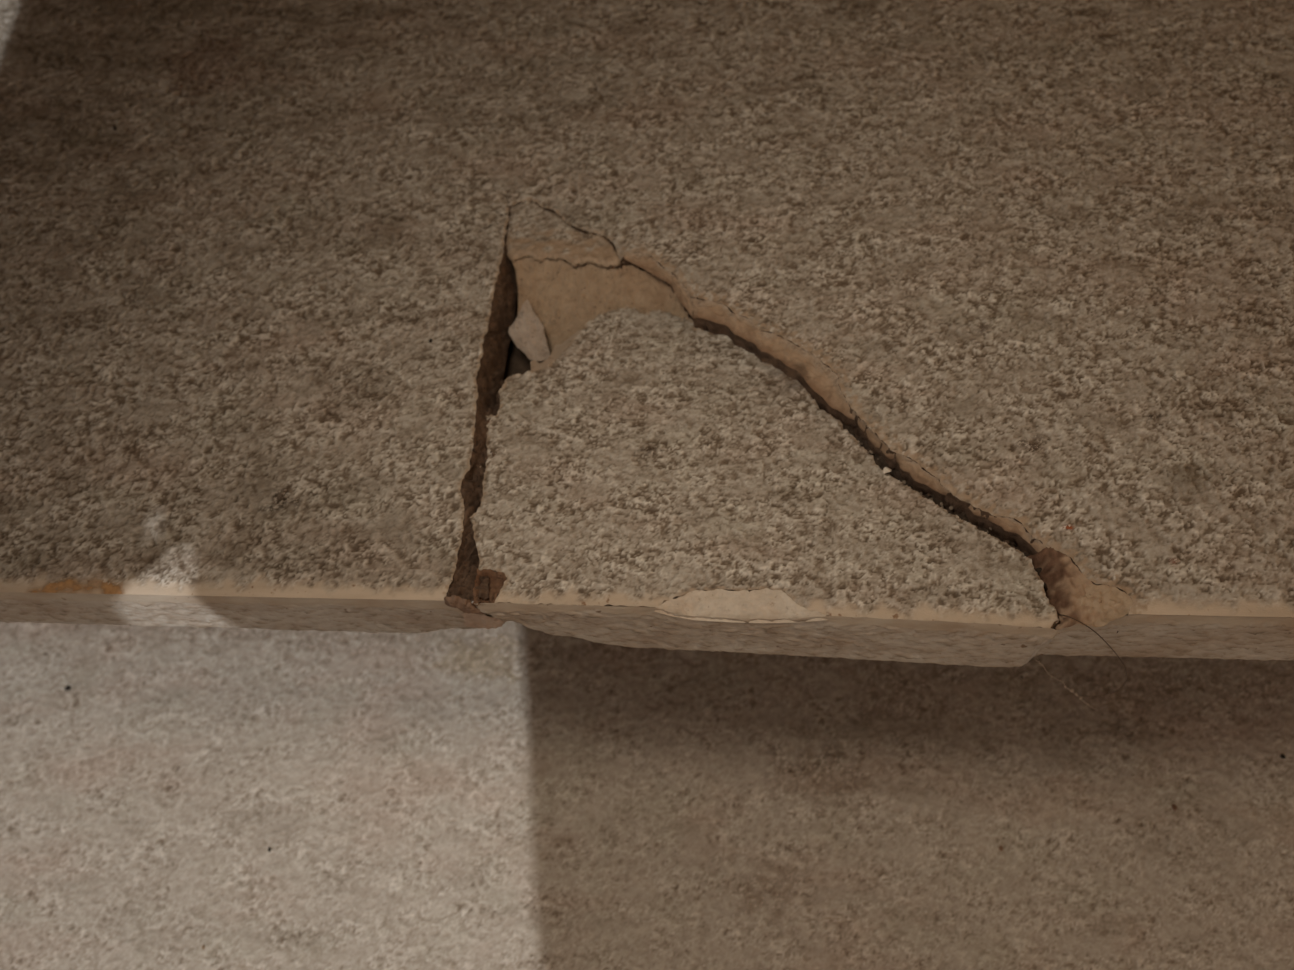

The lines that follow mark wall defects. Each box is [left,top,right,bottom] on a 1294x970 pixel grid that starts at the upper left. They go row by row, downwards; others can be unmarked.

crack [444,197,617,614]
spalling [462,201,1133,667]
crack [684,298,1050,593]